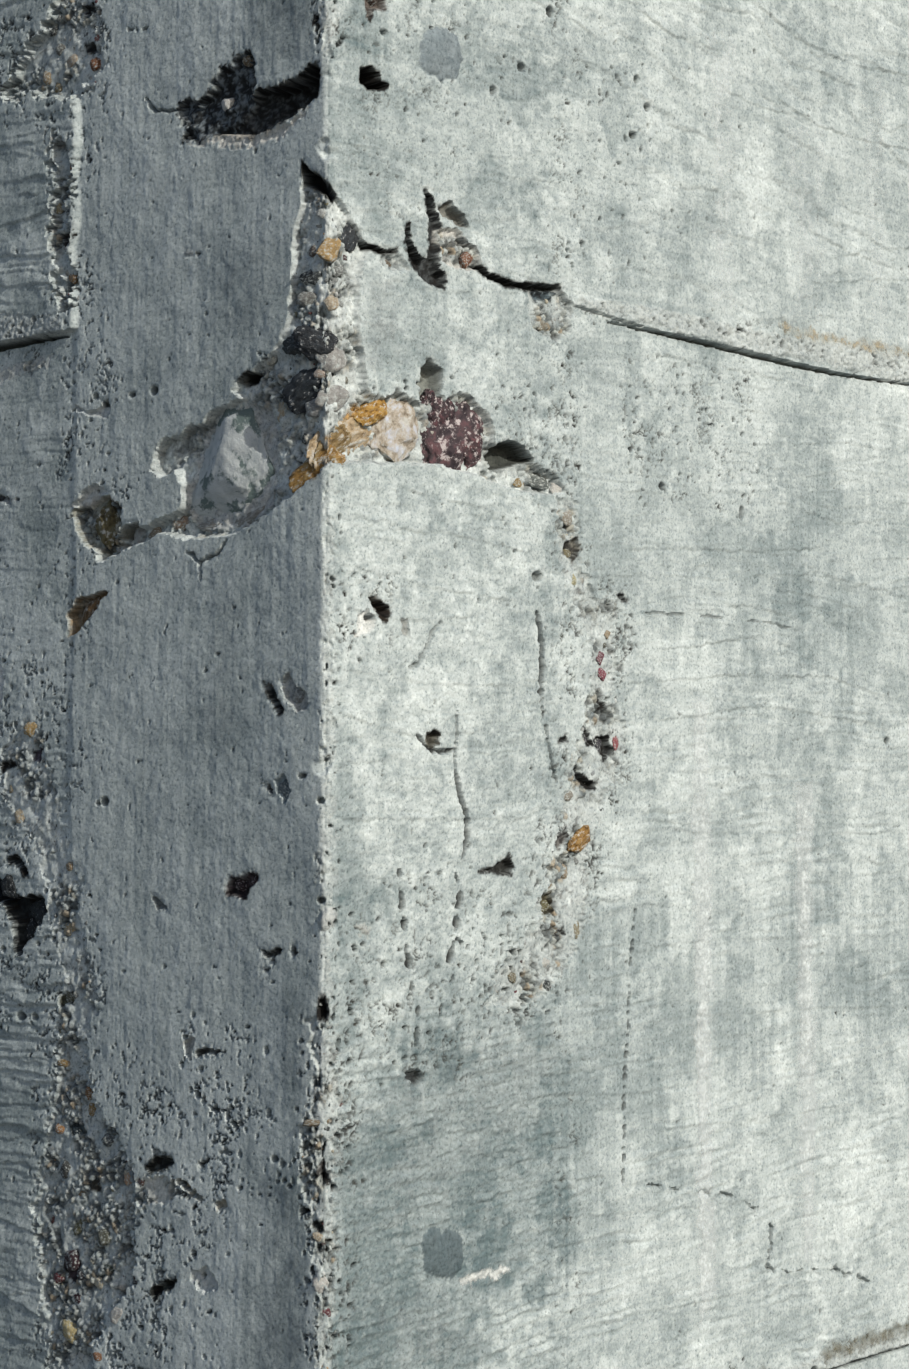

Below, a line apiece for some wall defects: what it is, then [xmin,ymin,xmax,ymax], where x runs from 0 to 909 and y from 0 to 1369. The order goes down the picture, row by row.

spalling [176,48,321,152]
spalling [70,161,574,563]
peeling [7,854,29,877]